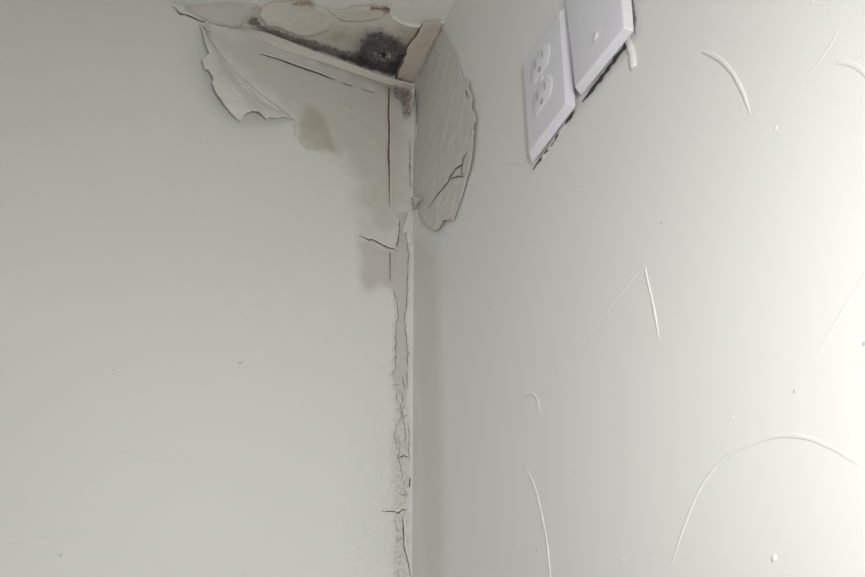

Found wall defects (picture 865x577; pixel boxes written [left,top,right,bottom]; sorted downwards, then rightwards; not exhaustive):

peeling [199,23,295,122]
damp [248,18,406,76]
peeling [259,0,445,83]
peeling [389,205,414,407]
crack [381,376,412,577]